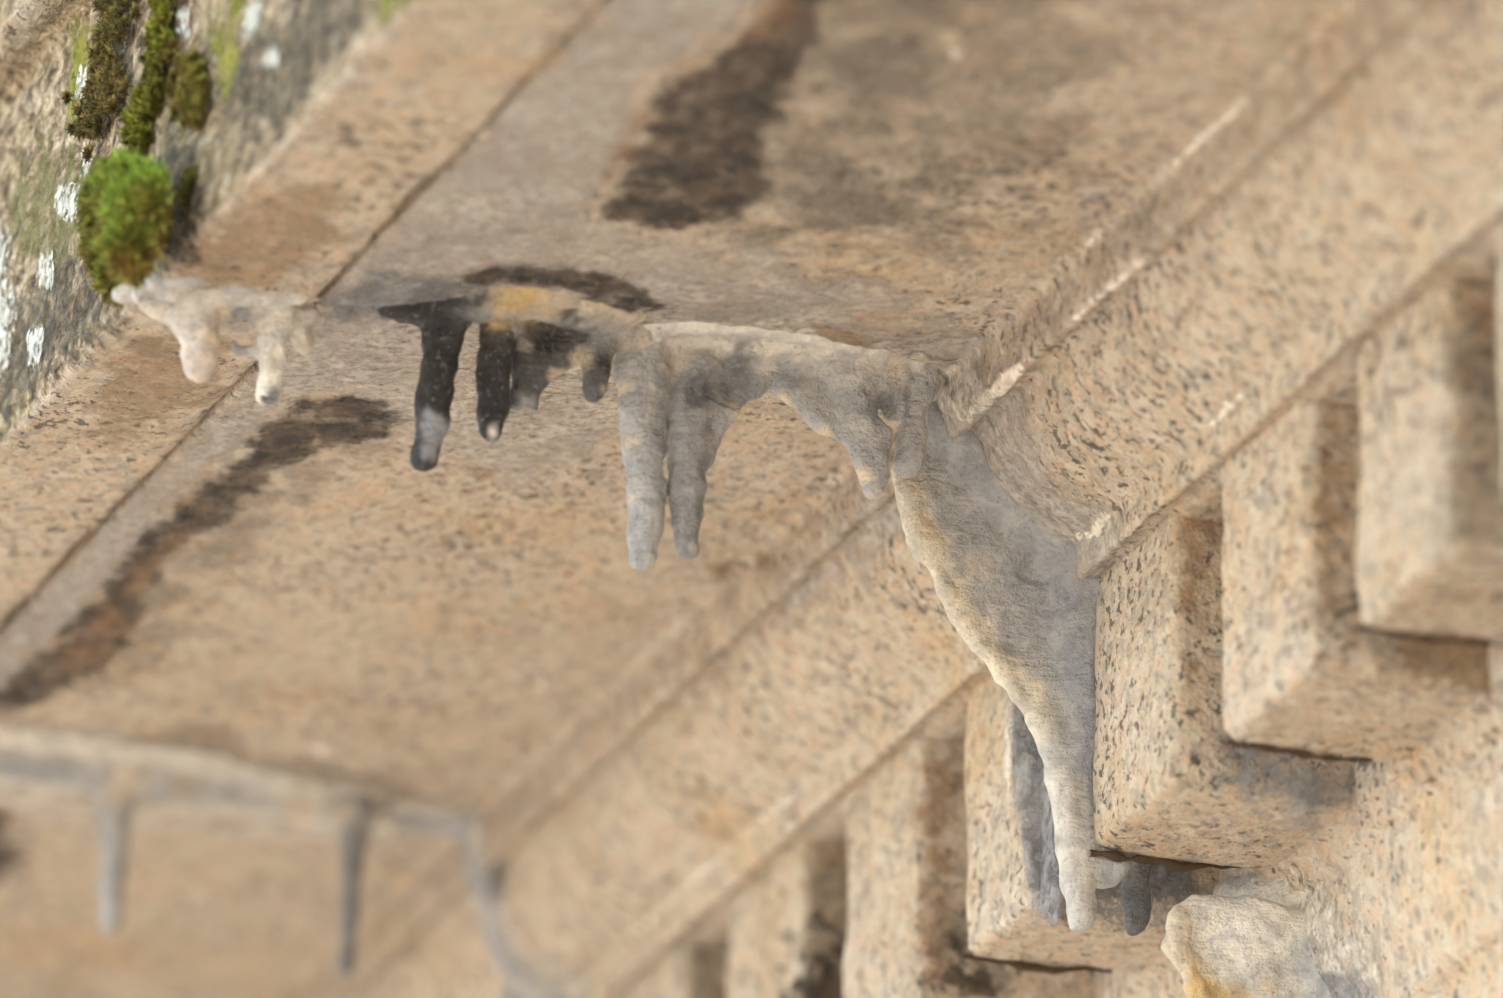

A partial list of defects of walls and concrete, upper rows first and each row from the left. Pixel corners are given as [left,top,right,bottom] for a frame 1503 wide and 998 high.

damp [0,0,1151,998]
damp [1161,872,1373,998]